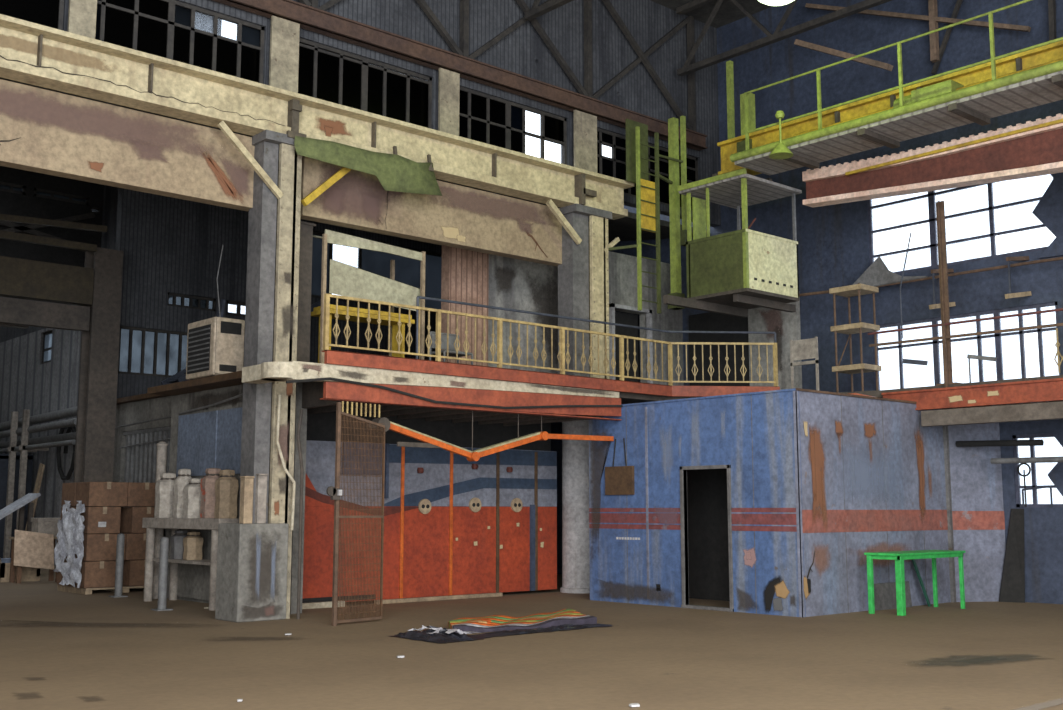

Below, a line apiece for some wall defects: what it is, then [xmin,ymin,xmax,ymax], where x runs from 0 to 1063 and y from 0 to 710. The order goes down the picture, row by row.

corrosion [203,153,242,199]
spalling [764,576,811,611]